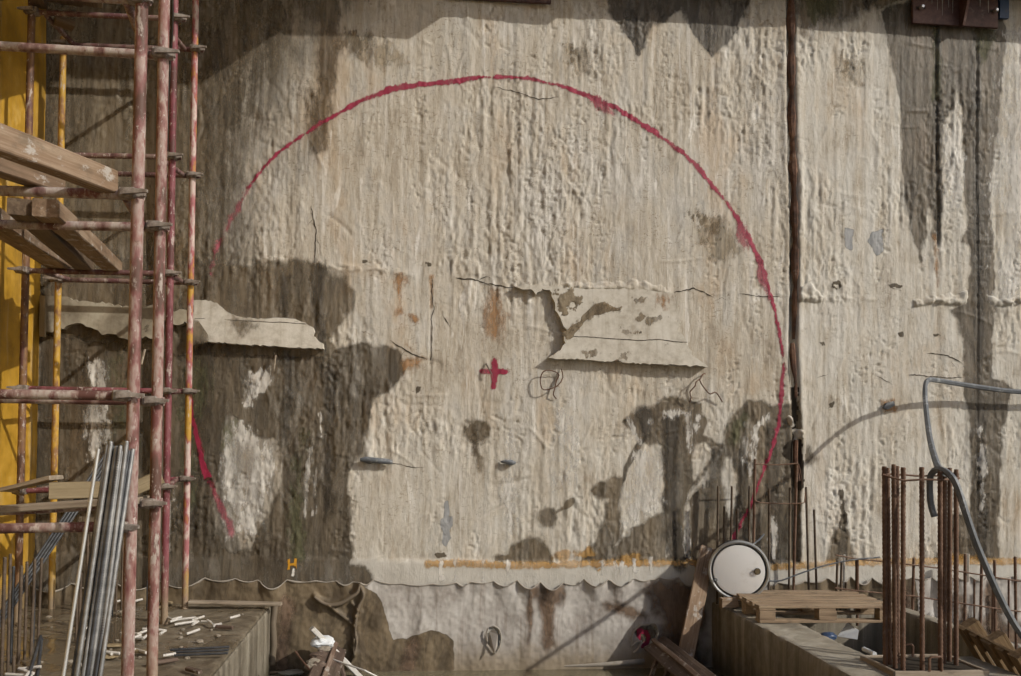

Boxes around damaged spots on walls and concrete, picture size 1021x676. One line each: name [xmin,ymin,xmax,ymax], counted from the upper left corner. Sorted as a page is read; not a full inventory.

water stain [608,0,750,57]
water stain [45,2,135,188]
flaking render [46,296,129,340]
flaking render [141,300,325,350]
water stain [136,0,454,673]
crack [390,280,450,360]
crack [457,276,513,288]
corrosion [484,289,505,337]
flaking render [514,283,708,368]
water stain [794,0,1021,562]
water stain [30,404,127,605]
water stain [482,396,817,649]